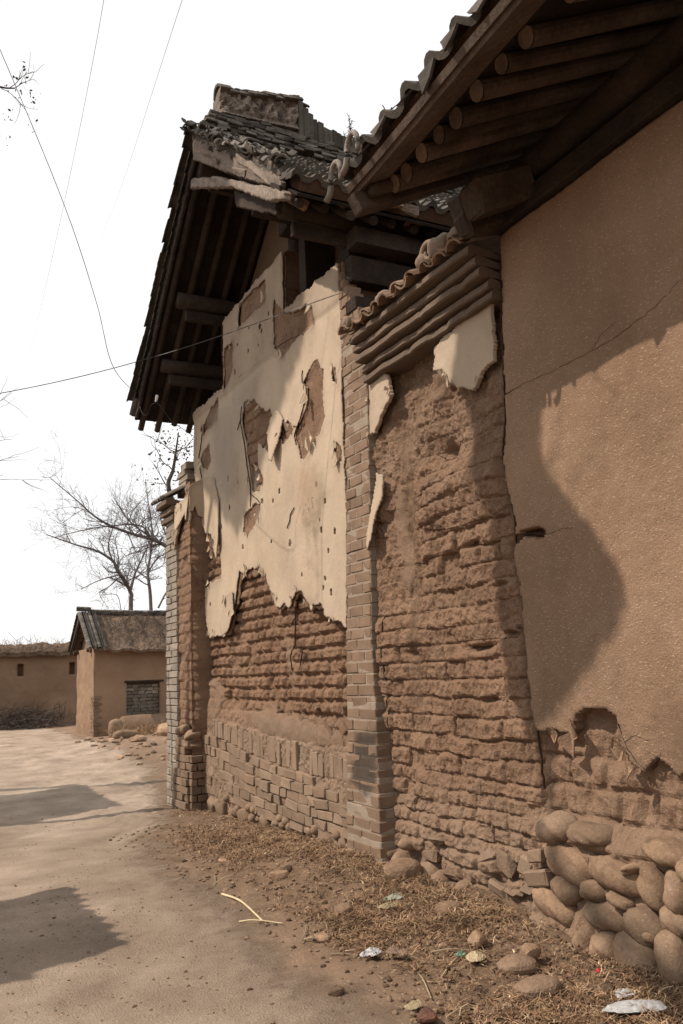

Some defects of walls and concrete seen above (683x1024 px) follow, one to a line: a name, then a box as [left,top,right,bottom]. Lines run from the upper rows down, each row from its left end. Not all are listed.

spalling [236,280,314,359]
flaking render [433,304,498,391]
crack [499,252,682,469]
flaking render [364,374,394,439]
spalling [243,360,337,549]
flaking render [366,473,384,549]
crack [512,504,573,544]
flaking render [212,591,234,639]
crack [537,731,546,789]
spalling [530,708,683,875]
spalling [531,899,602,937]